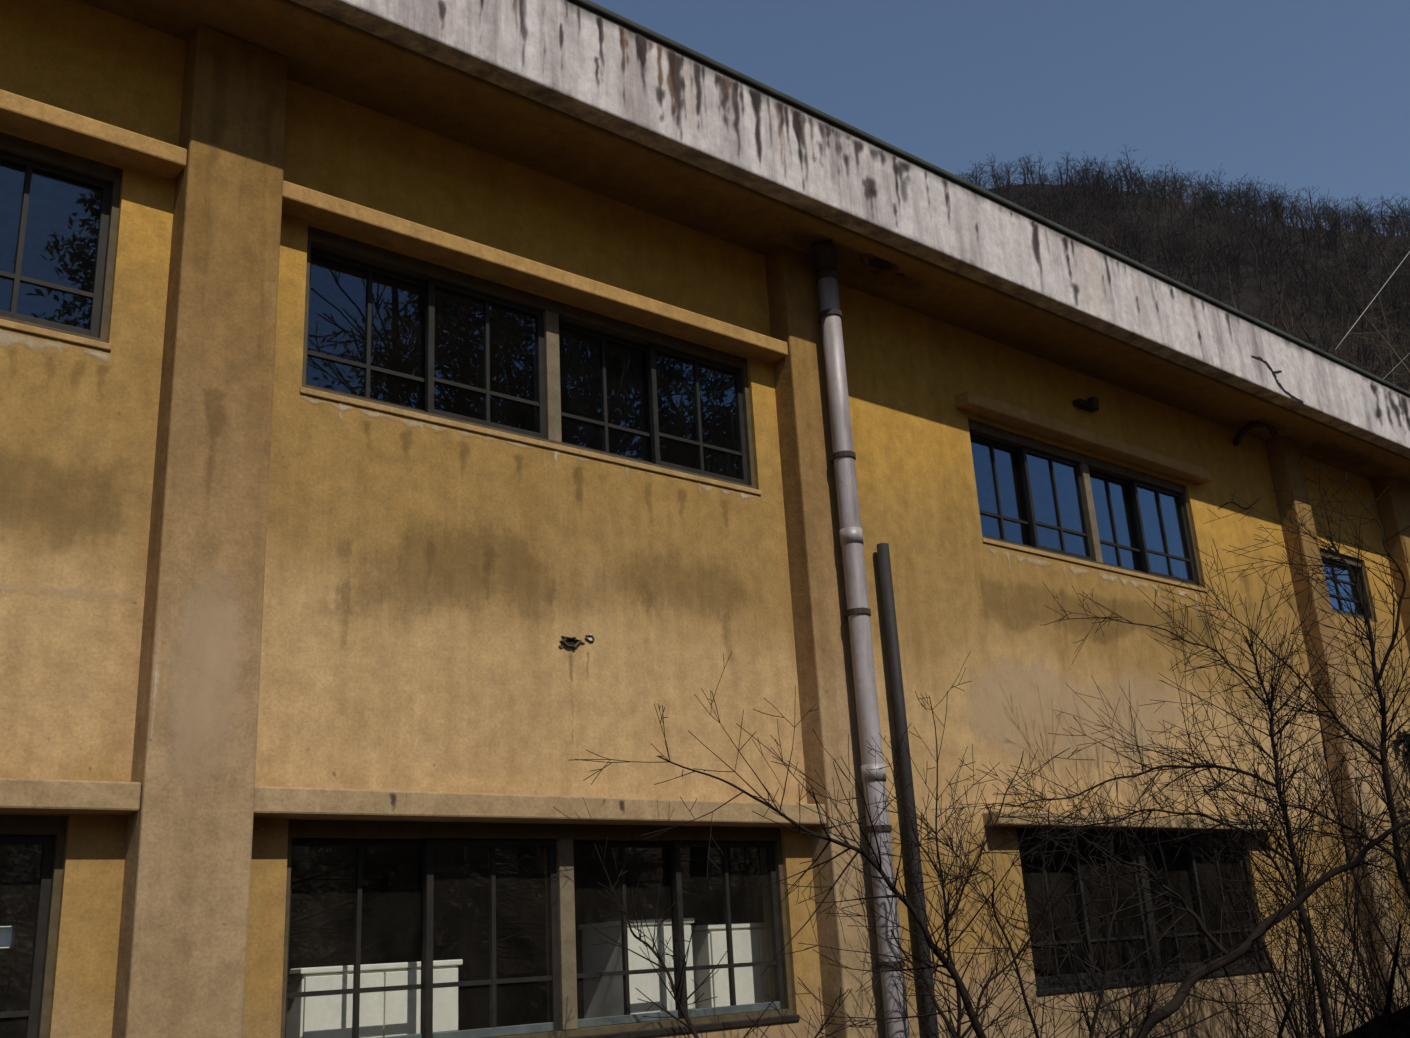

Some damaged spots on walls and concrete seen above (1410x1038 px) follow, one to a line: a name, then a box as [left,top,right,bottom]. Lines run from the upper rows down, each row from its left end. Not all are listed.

water stain [515,0,526,37]
water stain [595,16,927,213]
water stain [1032,221,1042,270]
water stain [1062,236,1080,305]
water stain [0,334,54,346]
water stain [1371,383,1410,427]